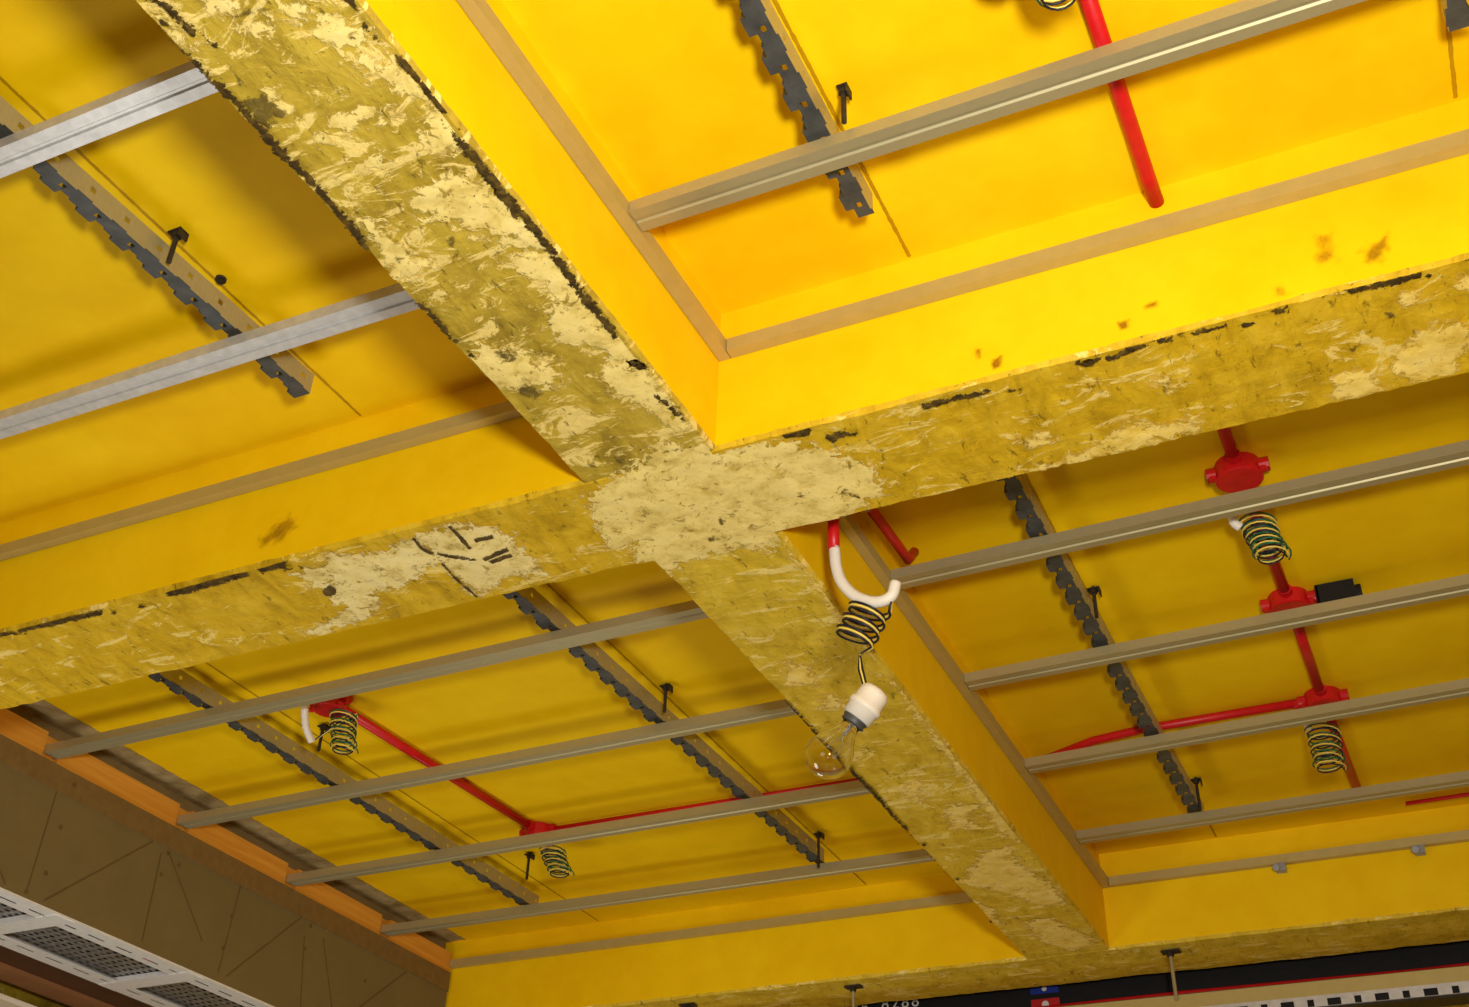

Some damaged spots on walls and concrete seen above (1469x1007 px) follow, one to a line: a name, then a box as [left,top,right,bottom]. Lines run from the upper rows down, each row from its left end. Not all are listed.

spalling [0,610,117,638]
peeling [138,0,899,661]